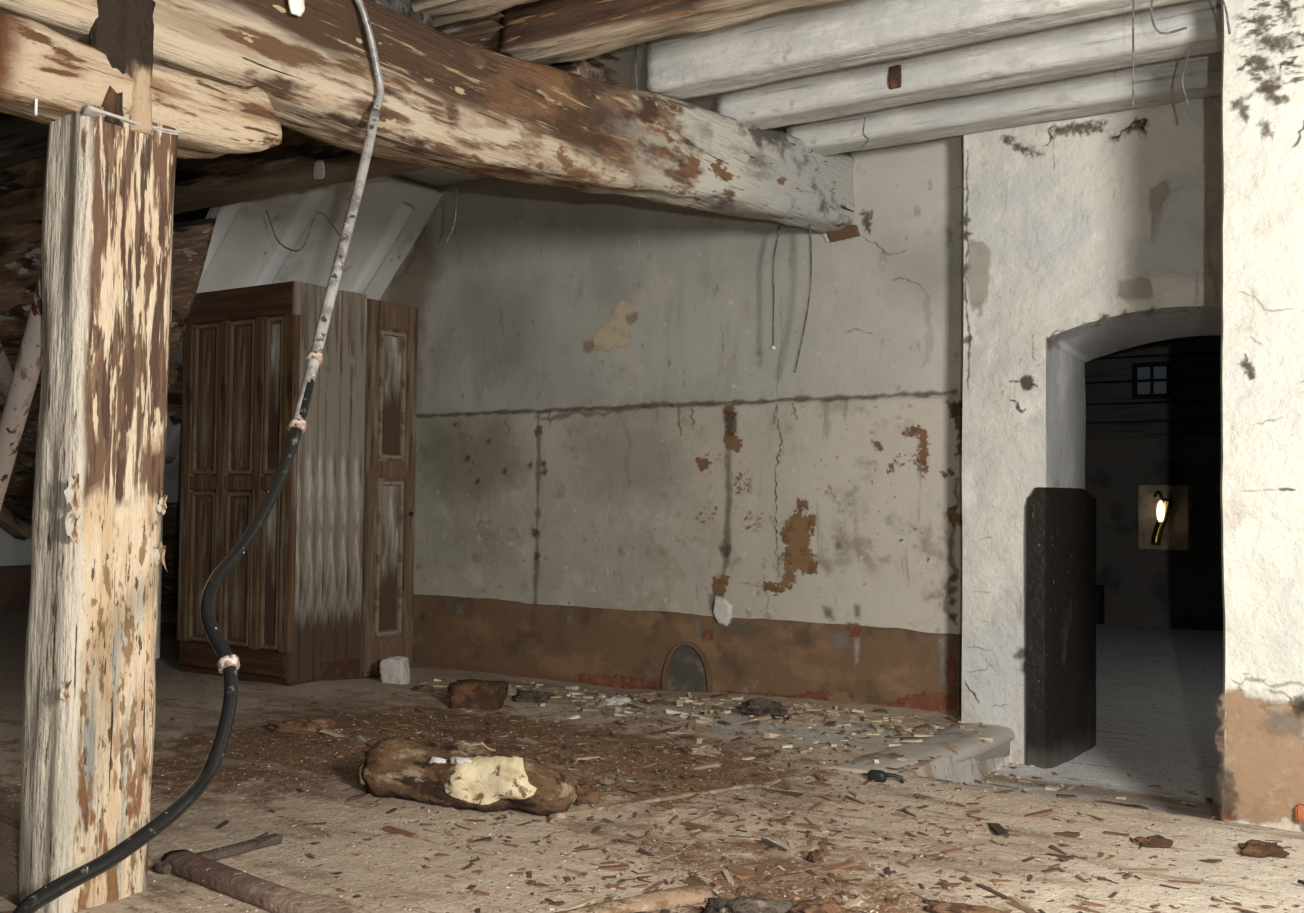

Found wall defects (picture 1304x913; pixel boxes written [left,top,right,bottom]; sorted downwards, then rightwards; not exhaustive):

water stain [1238,0,1304,103]
water stain [1045,118,1148,146]
water stain [1232,98,1273,136]
peeling [585,300,637,351]
corrosion [696,402,750,597]
corrosion [763,498,818,596]
flaking render [1220,690,1304,825]